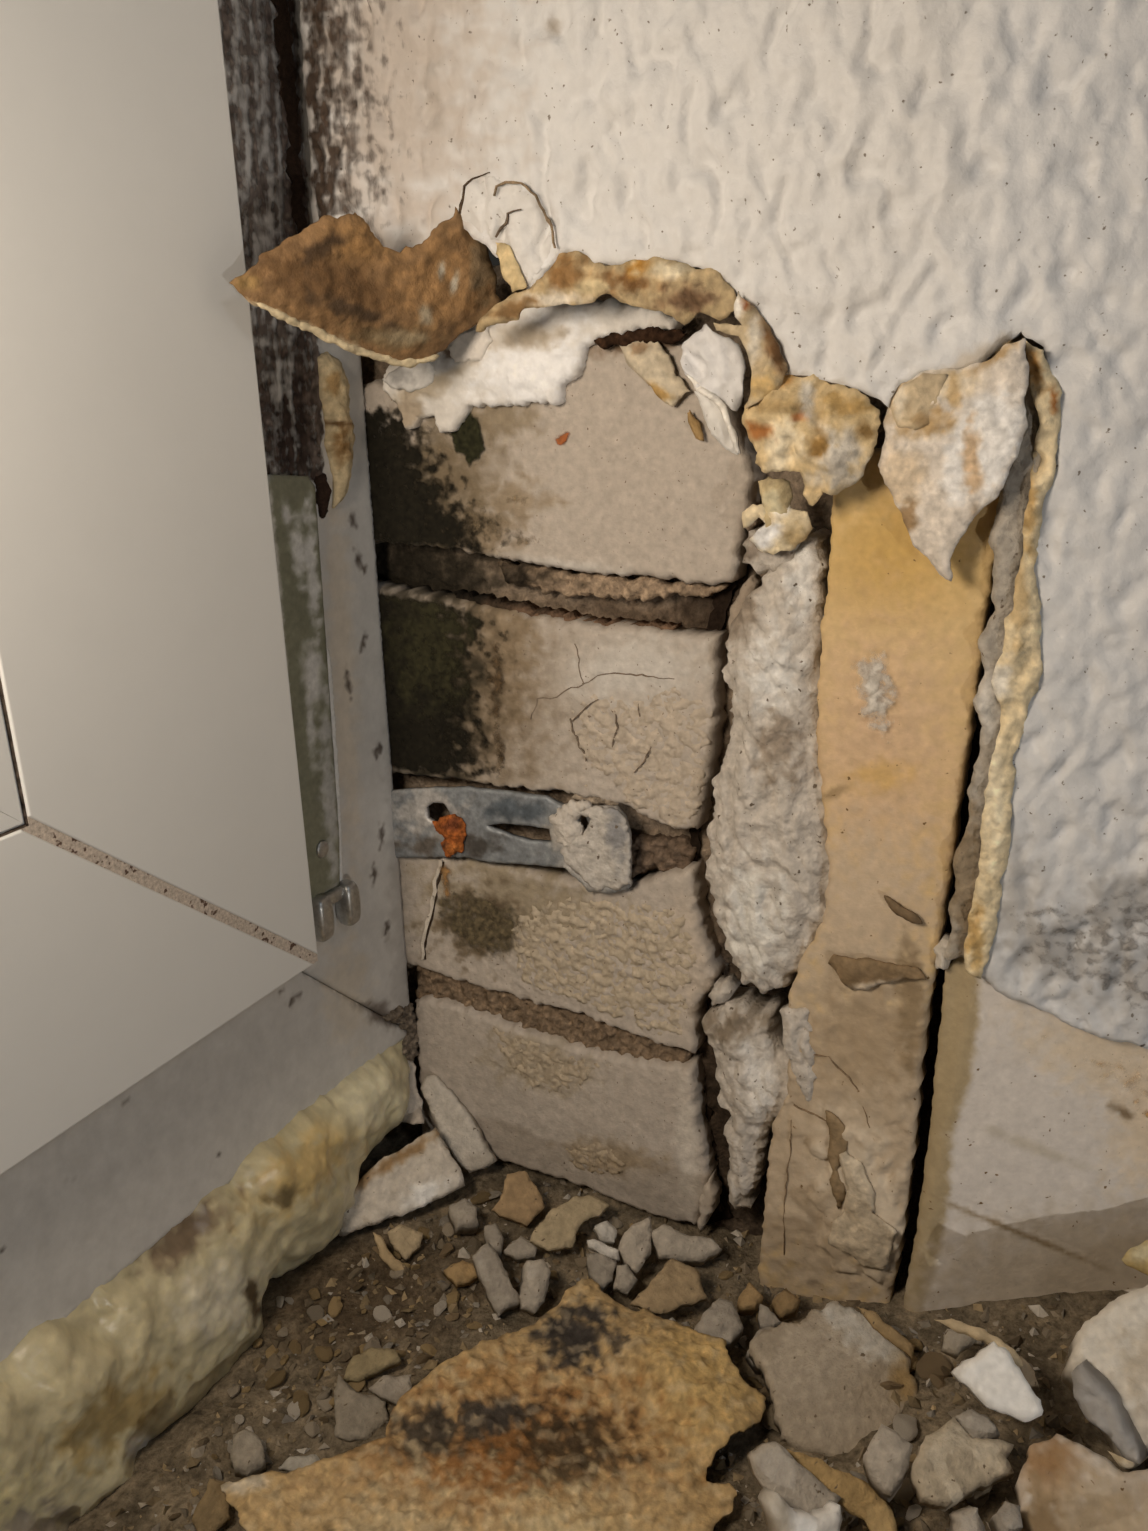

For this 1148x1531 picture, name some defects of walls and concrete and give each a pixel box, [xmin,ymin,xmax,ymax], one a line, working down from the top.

damp [219,0,384,271]
damp [249,303,324,481]
flaking render [382,298,684,433]
damp [365,406,527,553]
damp [379,594,507,777]
spalling [857,659,894,731]
spalling [944,376,1042,960]
rust [432,814,467,897]
flaking render [566,502,832,1233]
spalling [511,897,697,1036]
crack [895,1198,911,1286]